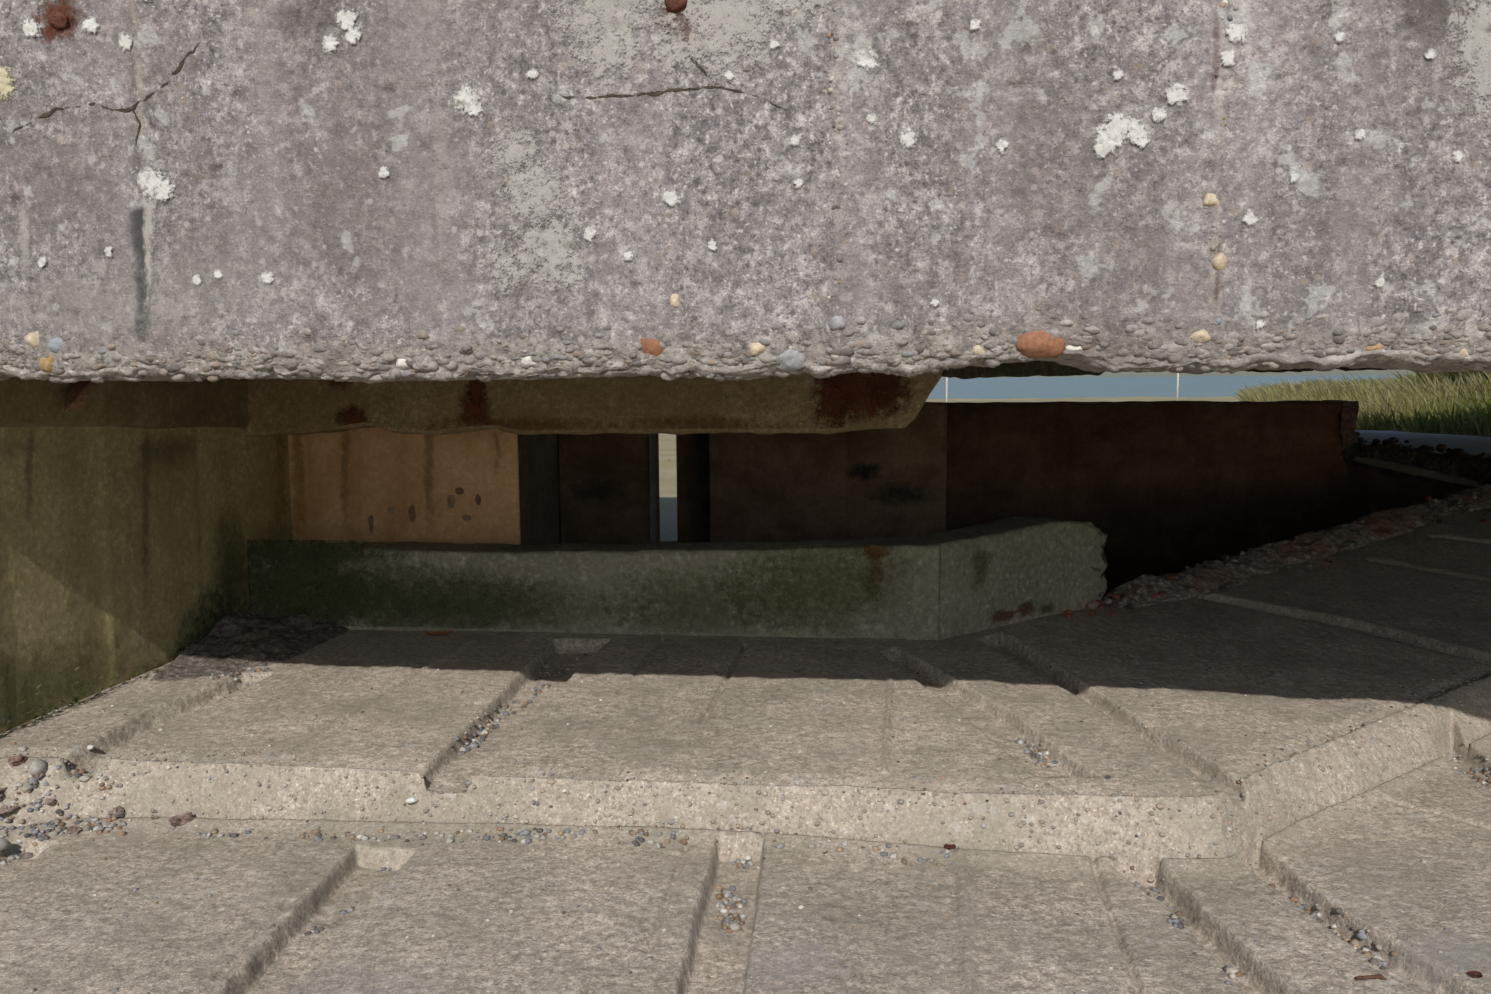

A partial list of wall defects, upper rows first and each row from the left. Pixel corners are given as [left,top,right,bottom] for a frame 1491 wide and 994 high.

rust [33,0,79,42]
crack [0,42,200,145]
crack [548,53,794,124]
leakage [131,201,156,337]
rust [419,380,610,431]
rust [815,372,910,428]